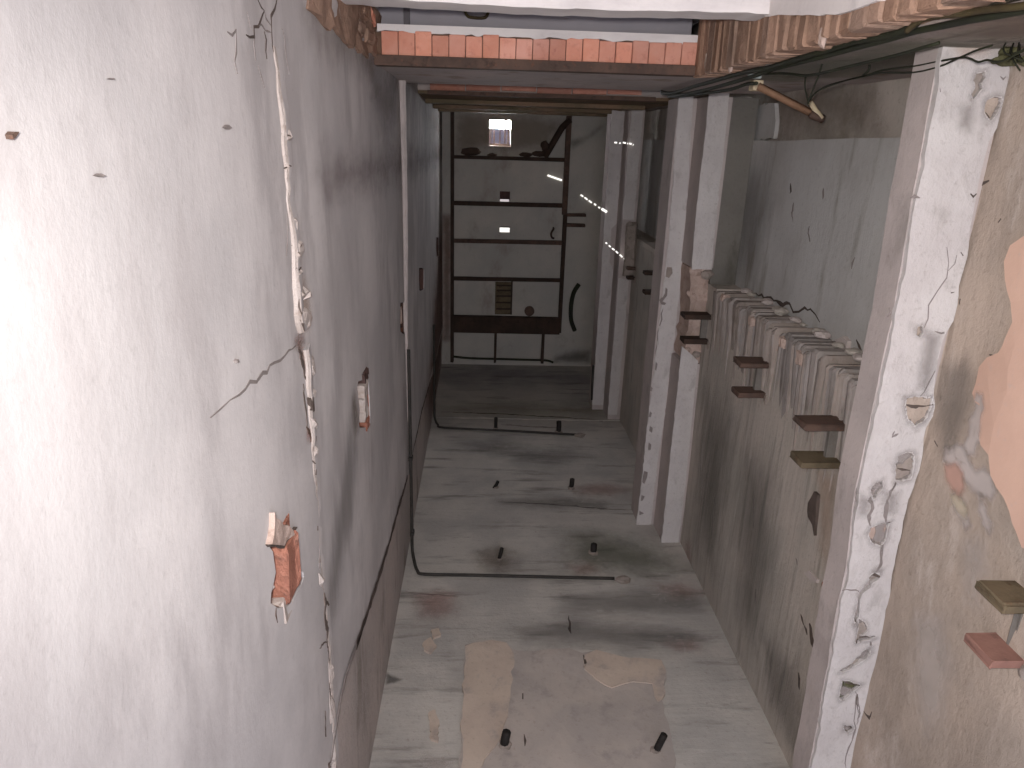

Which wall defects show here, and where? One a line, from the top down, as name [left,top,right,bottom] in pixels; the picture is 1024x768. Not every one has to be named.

crack [227,0,289,88]
spalling [971,73,983,97]
spalling [674,262,715,363]
crack [756,293,820,323]
crack [210,301,317,475]
spalling [273,46,339,768]
spalling [906,397,933,424]
peeling [943,236,1024,548]
spalling [895,453,913,479]
spalling [847,618,875,667]